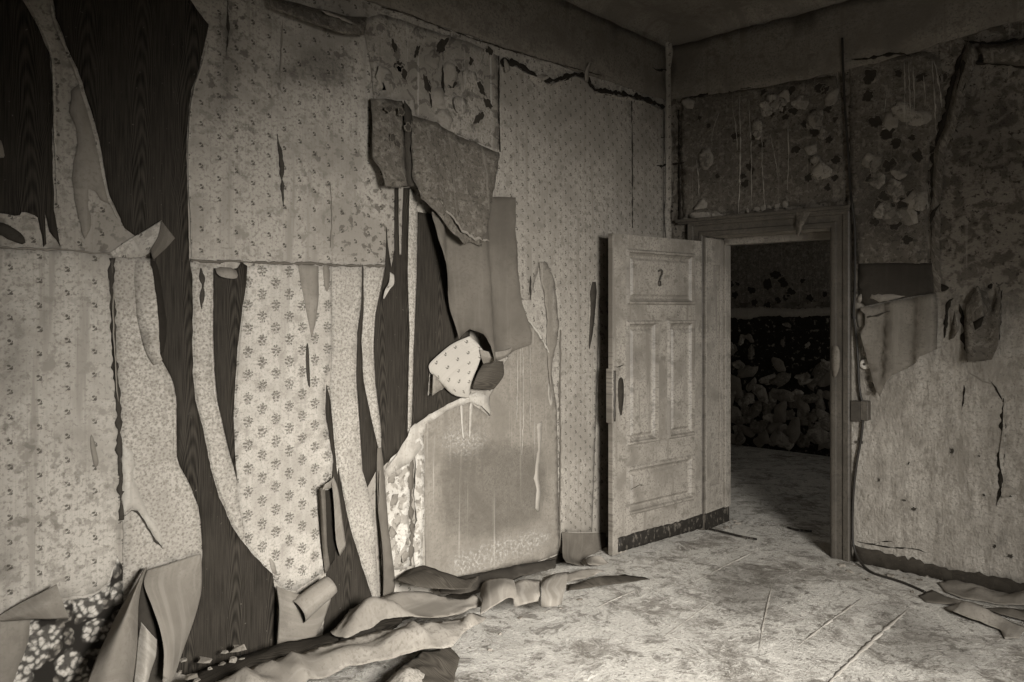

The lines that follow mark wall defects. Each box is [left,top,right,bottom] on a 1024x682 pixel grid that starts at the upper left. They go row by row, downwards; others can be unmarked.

peeling [365,14,665,152]
peeling [680,51,949,264]
flaking render [385,319,562,595]
crack [962,373,1017,505]